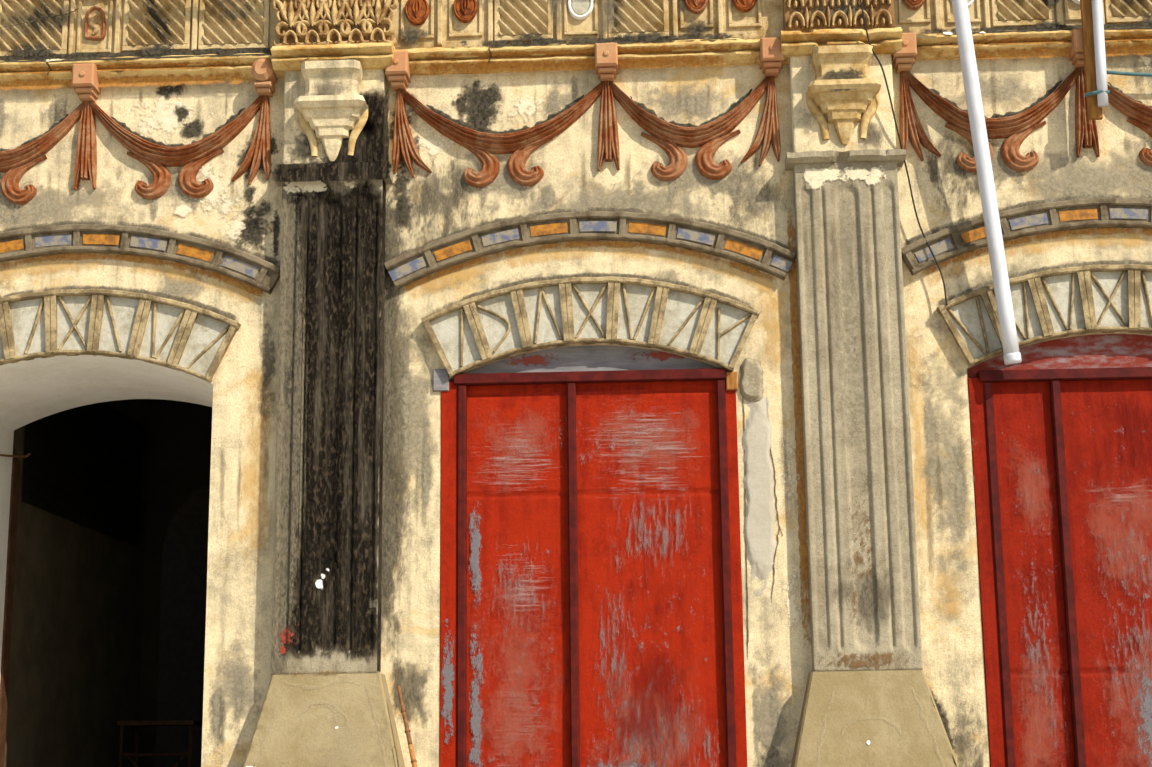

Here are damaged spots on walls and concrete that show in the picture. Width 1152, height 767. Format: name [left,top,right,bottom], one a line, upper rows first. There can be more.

leakage [0,101,68,151]
peeling [804,165,886,189]
leakage [0,178,110,232]
leakage [0,266,236,320]
leakage [111,80,788,722]
leakage [212,640,256,742]